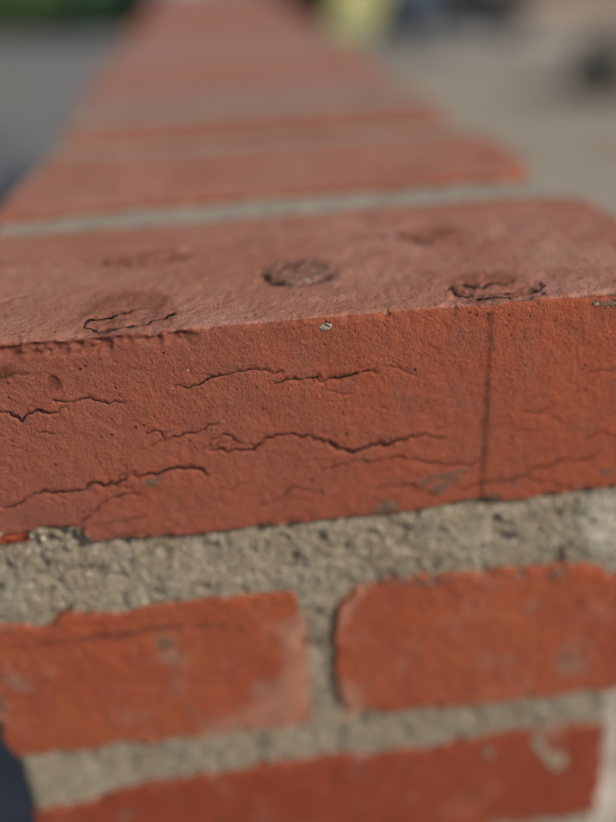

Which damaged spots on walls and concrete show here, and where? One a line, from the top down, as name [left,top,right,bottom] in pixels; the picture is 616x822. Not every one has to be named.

crack [175,365,414,395]
crack [0,396,121,434]
crack [3,423,615,528]